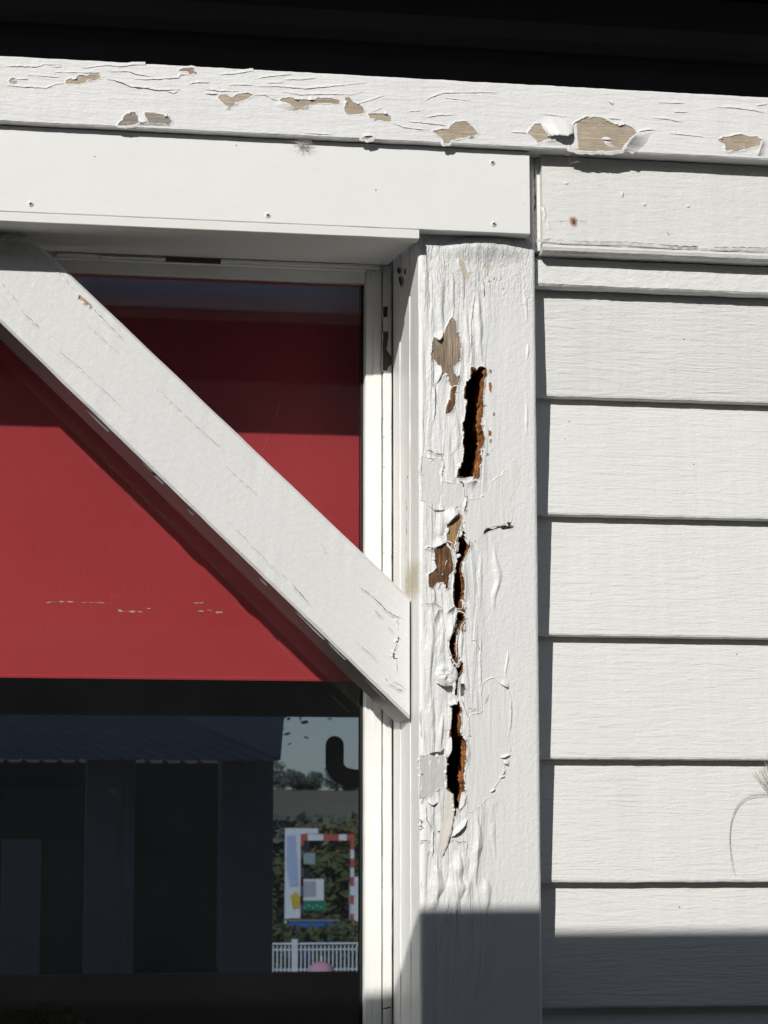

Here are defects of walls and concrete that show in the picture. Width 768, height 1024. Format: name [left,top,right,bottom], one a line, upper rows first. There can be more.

peeling [64,71,101,86]
peeling [176,65,197,76]
peeling [216,91,255,111]
peeling [115,110,174,129]
peeling [274,94,392,143]
peeling [430,120,480,146]
peeling [526,114,652,155]
peeling [717,132,768,156]
peeling [416,316,521,857]